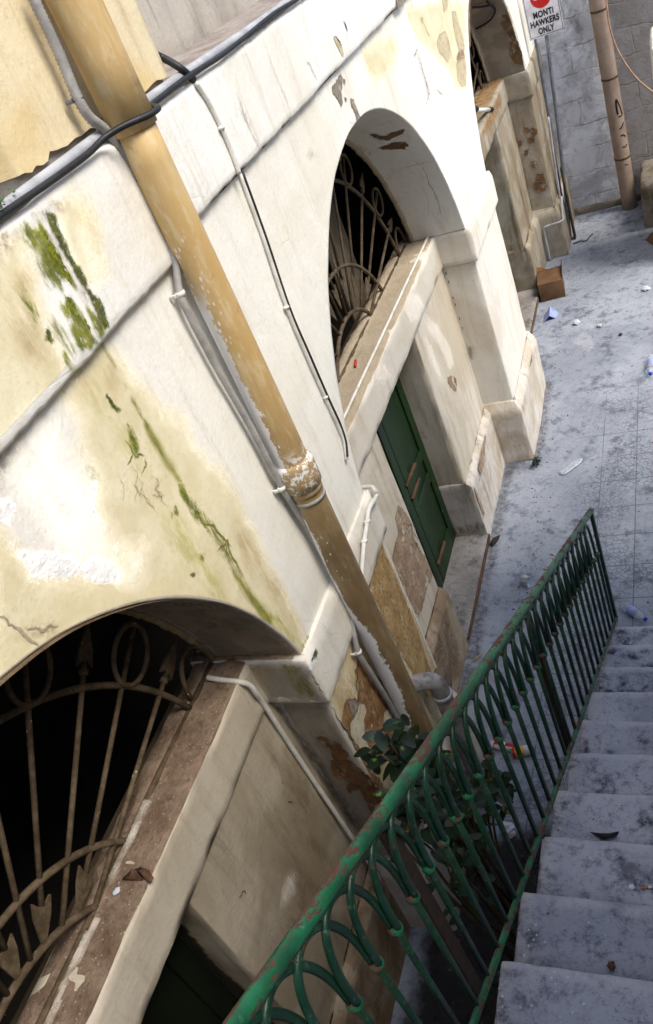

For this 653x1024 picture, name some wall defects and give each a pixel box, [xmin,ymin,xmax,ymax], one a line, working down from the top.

peeling [396,0,525,86]
peeling [332,74,360,119]
peeling [371,129,409,150]
crack [120,466,168,511]
water stain [0,348,317,700]
crack [0,615,58,645]
peeling [279,636,398,833]